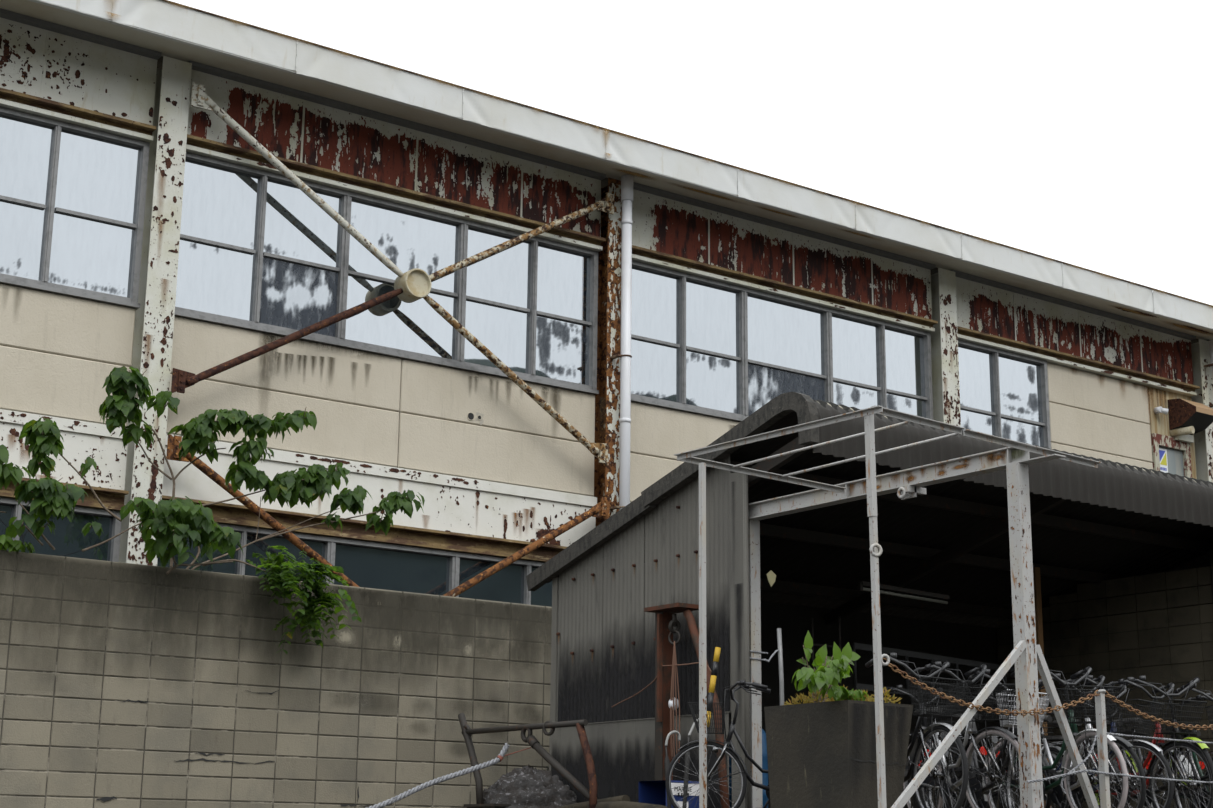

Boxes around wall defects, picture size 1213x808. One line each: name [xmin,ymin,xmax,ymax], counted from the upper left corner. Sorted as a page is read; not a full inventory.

corrosion [0,24,88,106]
corrosion [142,81,600,391]
spalling [467,412,484,425]
corrosion [0,409,167,566]
corrosion [296,454,586,546]